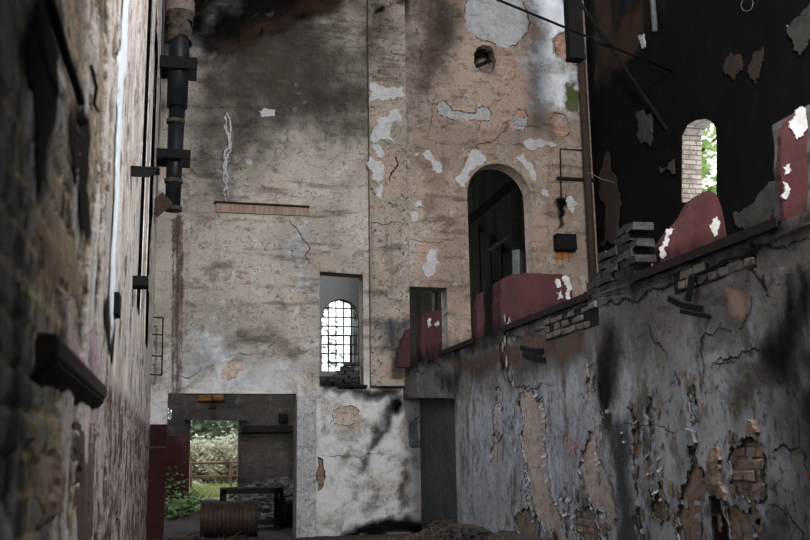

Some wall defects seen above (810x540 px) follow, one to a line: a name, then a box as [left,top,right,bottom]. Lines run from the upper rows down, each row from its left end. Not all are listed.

flaking render [464,0,531,48]
flaking render [436,100,492,121]
peeling [788,107,808,140]
crack [221,114,232,201]
peeling [781,164,791,199]
crack [597,282,674,307]
crack [694,238,810,384]
crack [649,327,680,385]
peeling [490,314,708,540]
flaking render [316,456,326,491]
leakage [397,459,410,506]
flaking render [717,430,768,540]